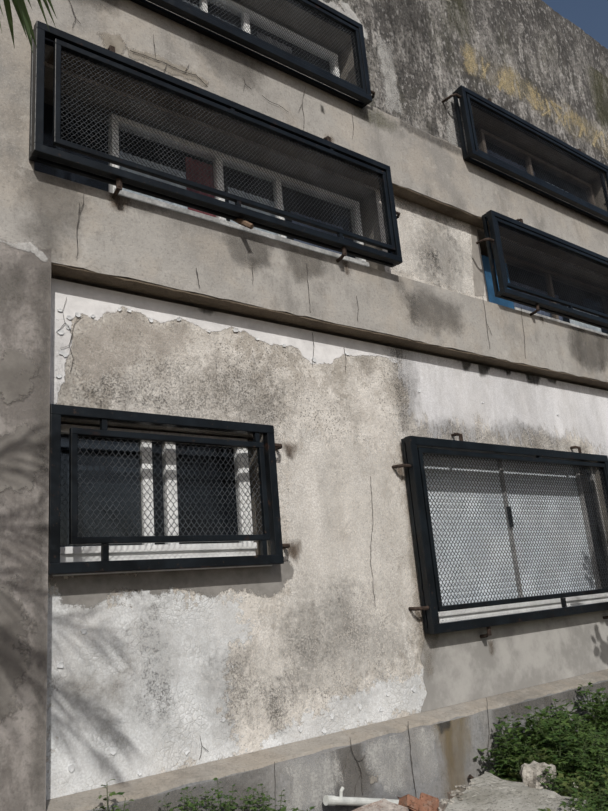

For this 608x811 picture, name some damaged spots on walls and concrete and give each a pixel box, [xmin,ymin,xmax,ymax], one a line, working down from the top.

crack [130,35,208,87]
peeling [50,278,608,456]
peeling [0,423,49,492]
peeling [0,574,37,721]
peeling [46,429,427,800]
leakage [416,721,450,767]